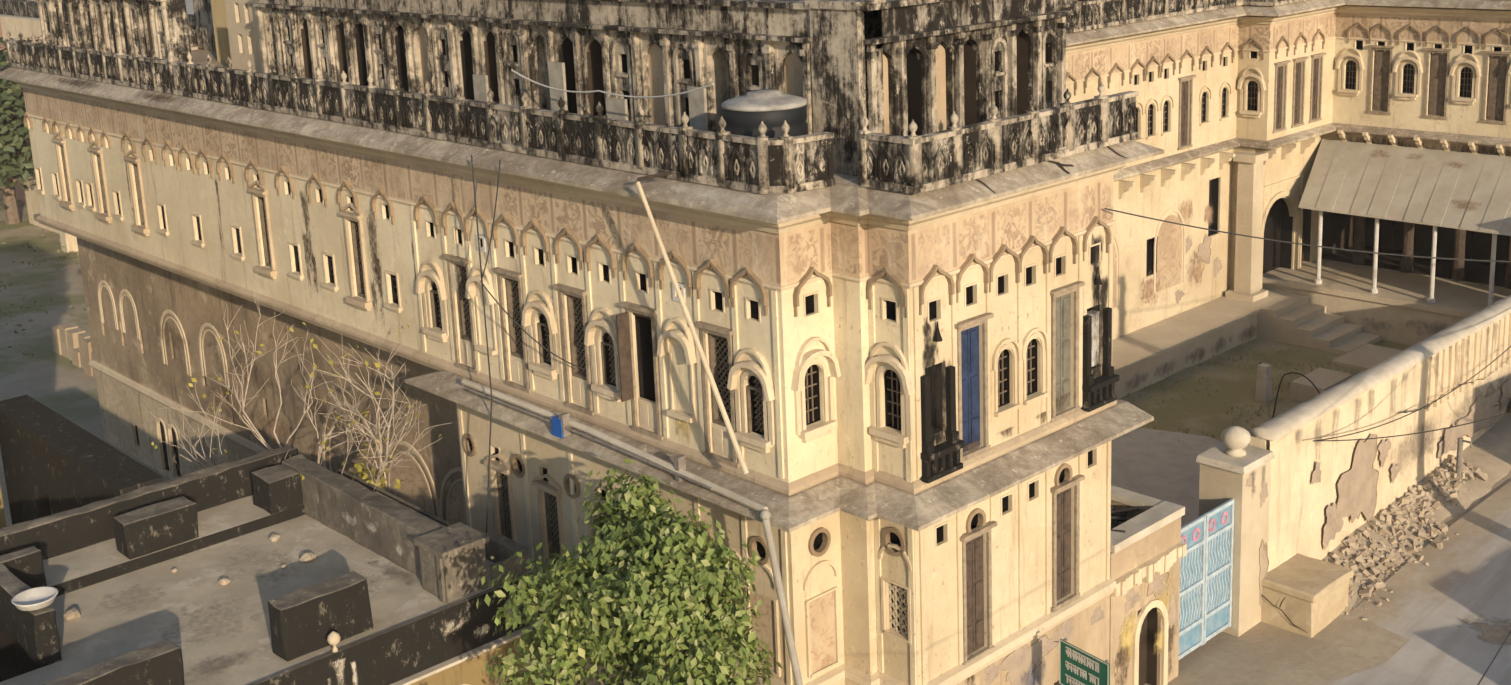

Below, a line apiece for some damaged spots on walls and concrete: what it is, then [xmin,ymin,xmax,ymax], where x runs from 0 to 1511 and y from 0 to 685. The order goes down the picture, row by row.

spalling [1311,434,1401,550]